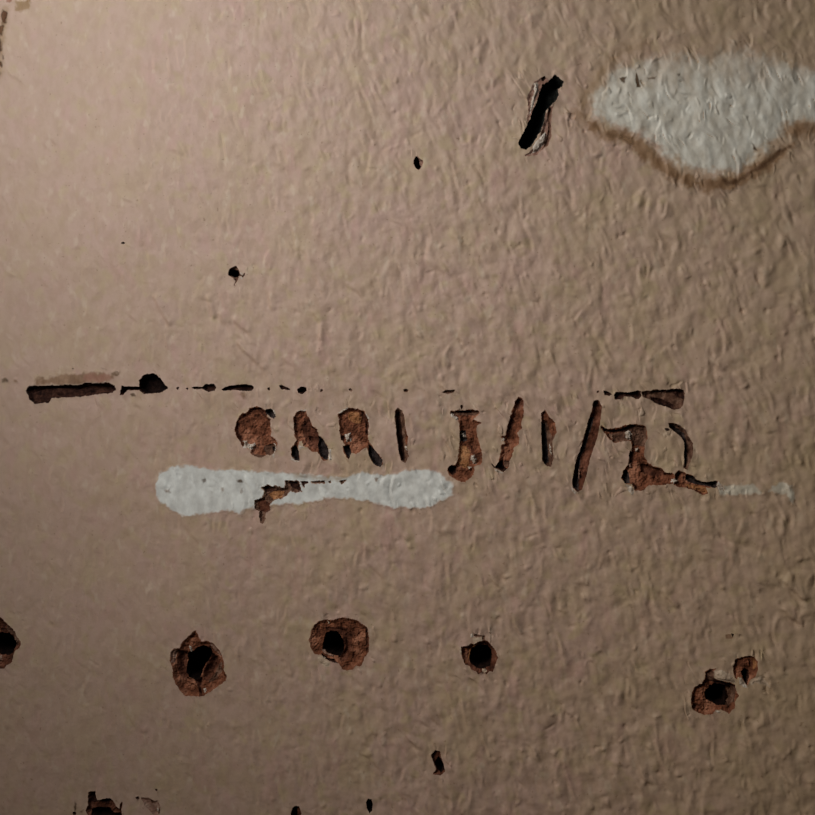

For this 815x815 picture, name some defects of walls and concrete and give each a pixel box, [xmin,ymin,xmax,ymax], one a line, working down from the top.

spalling [518,75,564,156]
water stain [561,30,815,200]
spalling [254,480,346,524]
spalling [0,617,21,669]
spalling [169,630,227,697]
spalling [309,617,368,671]
spalling [459,634,498,674]
spalling [691,656,771,715]
spalling [86,791,123,815]